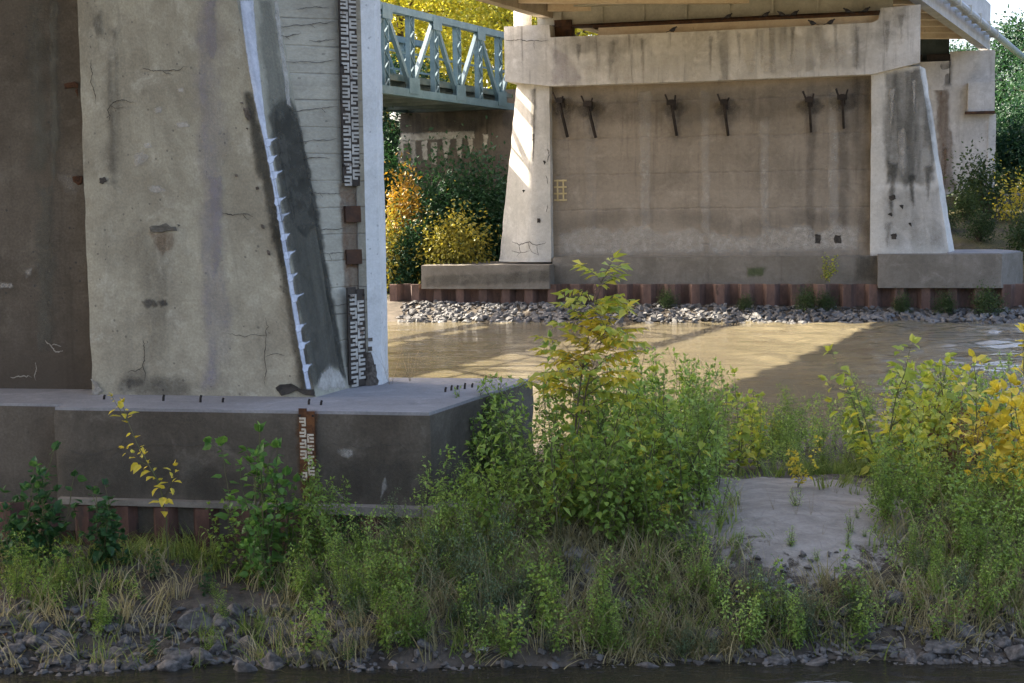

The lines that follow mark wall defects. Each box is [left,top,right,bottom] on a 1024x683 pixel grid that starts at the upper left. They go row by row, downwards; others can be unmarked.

crack [90,66,131,122]
leakage [887,64,955,207]
spalling [149,223,180,232]
leakage [241,0,346,390]
crack [228,318,284,383]